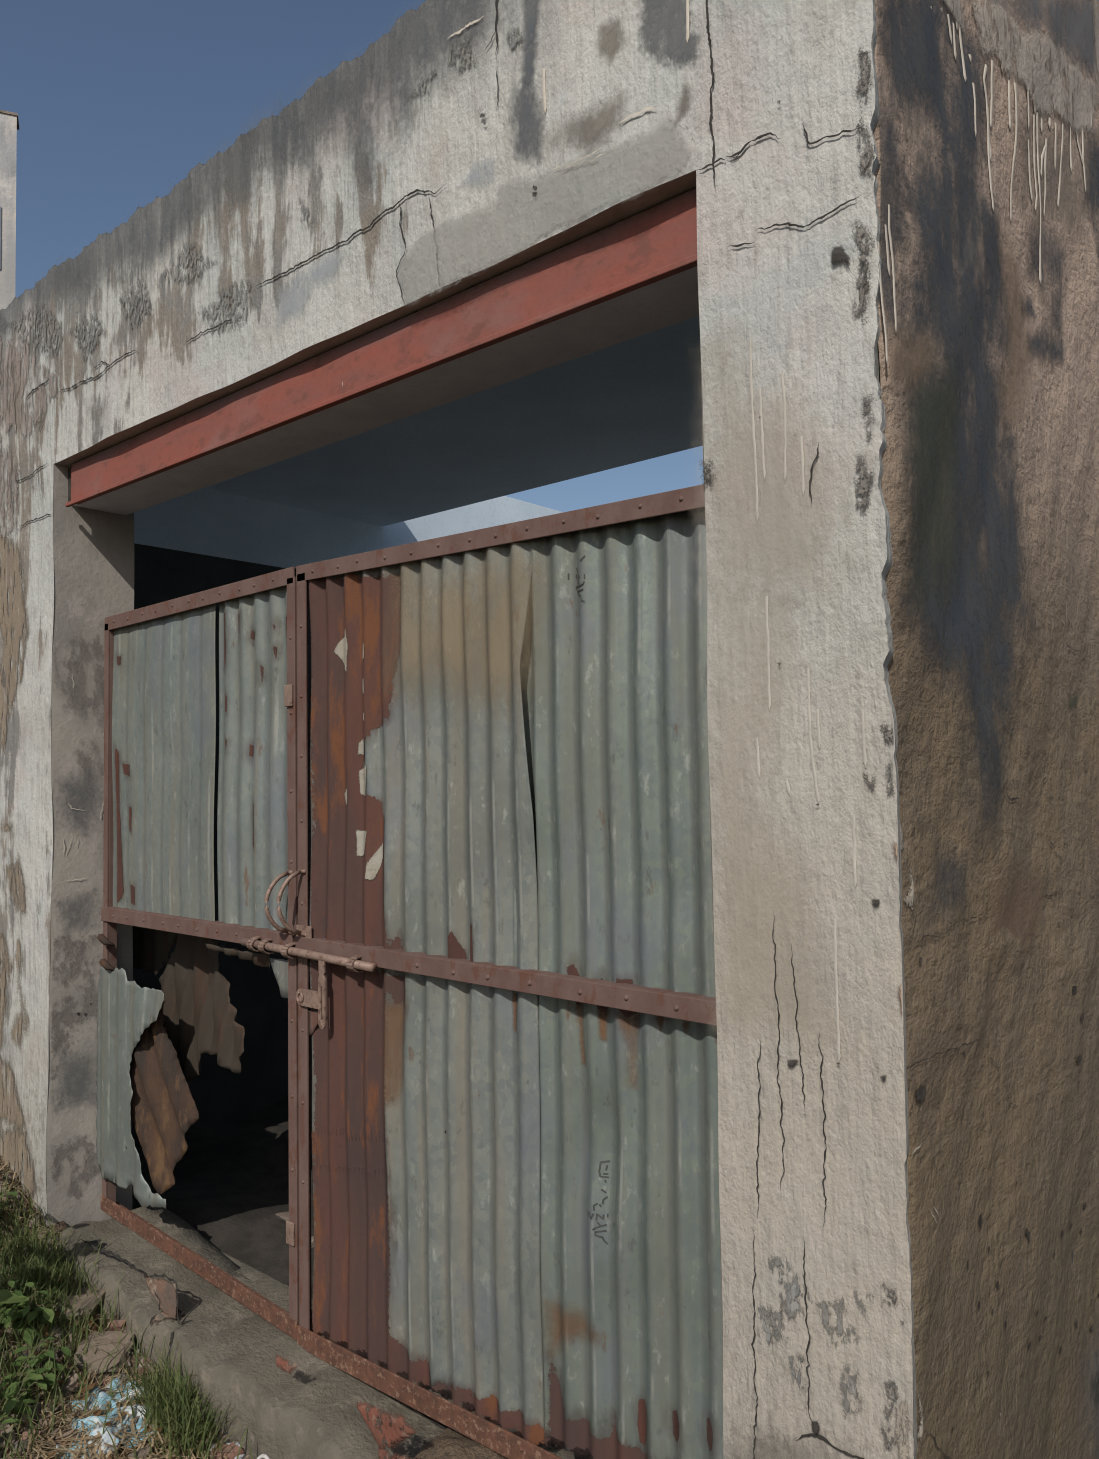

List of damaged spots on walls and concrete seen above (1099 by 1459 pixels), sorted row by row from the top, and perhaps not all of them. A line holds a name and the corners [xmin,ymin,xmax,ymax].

crack [252,183,447,303]
damp [265,0,486,182]
damp [514,0,547,157]
crack [727,196,859,247]
damp [877,0,1099,773]
flaking render [0,303,105,751]
flaking render [5,857,26,913]
flaking render [0,933,99,1199]
corrosion [309,572,514,949]
corrosion [448,924,473,962]
corrosion [310,959,647,1459]
crack [751,912,864,1459]